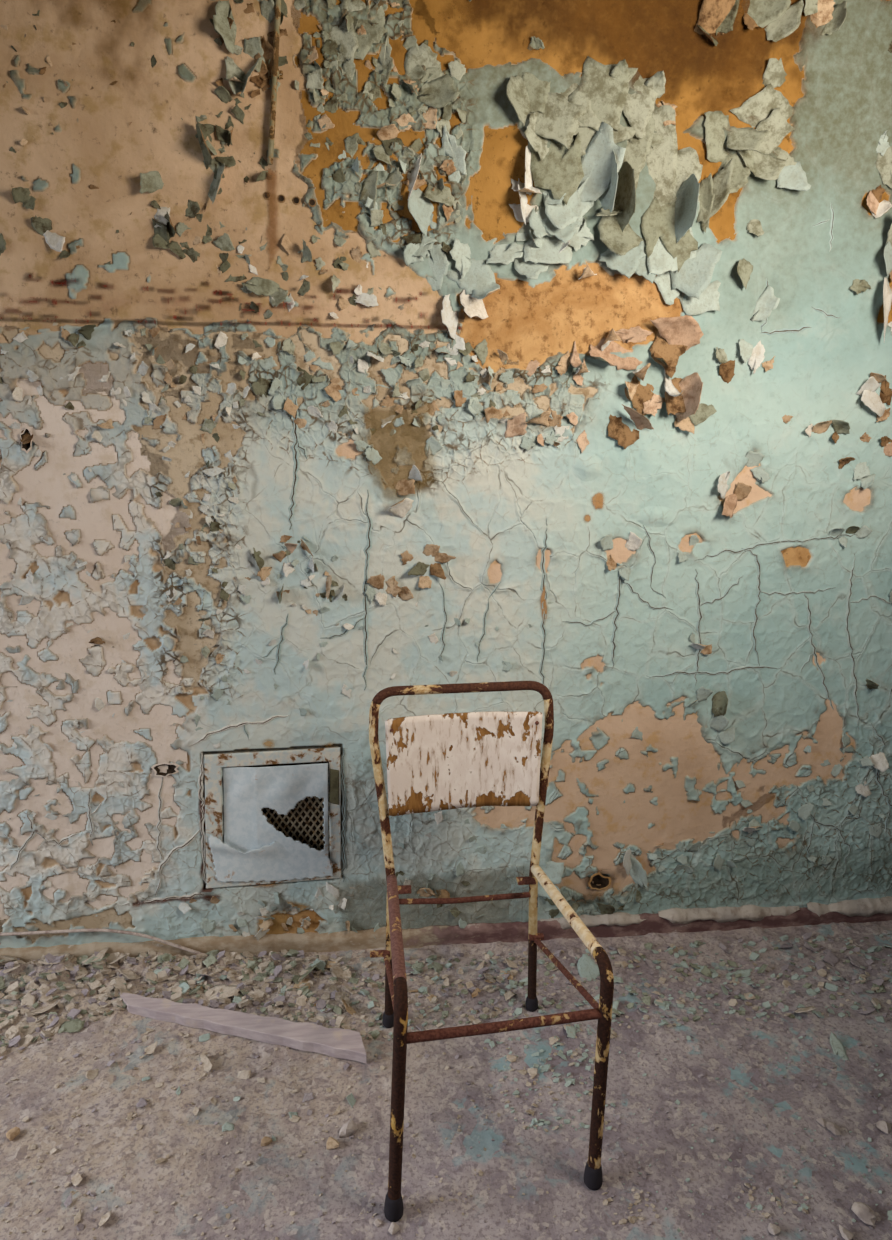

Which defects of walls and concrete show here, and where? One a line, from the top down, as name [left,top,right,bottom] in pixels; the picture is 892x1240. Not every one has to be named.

crack [440,584,448,657]
peeling [0,0,892,943]
crack [477,582,501,662]
crack [538,518,892,876]